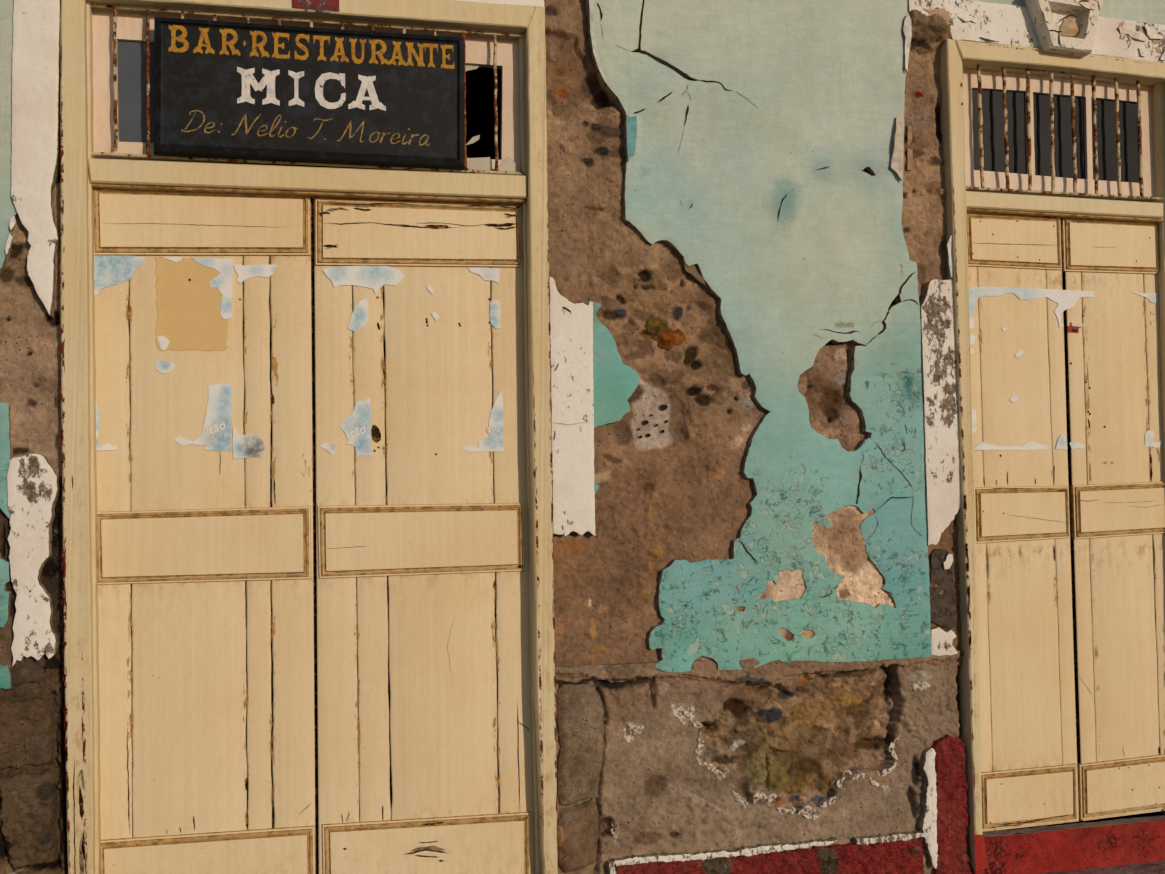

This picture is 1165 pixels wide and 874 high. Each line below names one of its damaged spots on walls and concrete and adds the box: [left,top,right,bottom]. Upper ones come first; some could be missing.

crack [597,0,758,152]
flaking render [890,9,953,302]
flaking render [0,182,65,713]
flaking render [544,0,767,681]
flaking render [798,341,868,451]
crack [810,272,919,345]
peeling [758,569,806,601]
flaking render [812,505,895,608]
flaking render [926,515,963,666]